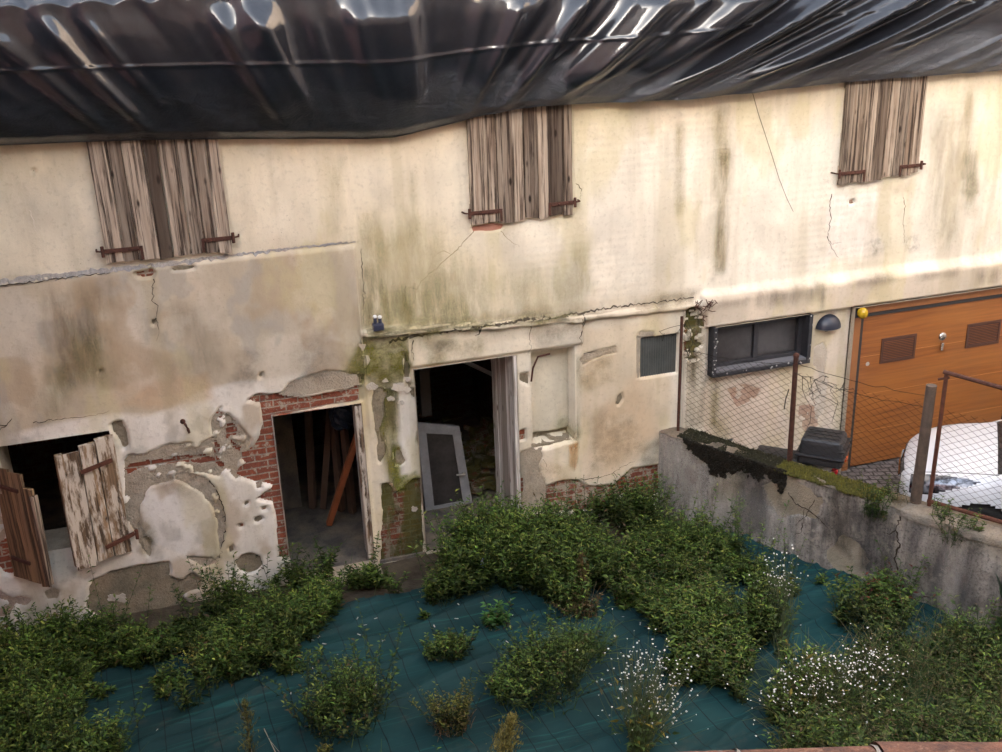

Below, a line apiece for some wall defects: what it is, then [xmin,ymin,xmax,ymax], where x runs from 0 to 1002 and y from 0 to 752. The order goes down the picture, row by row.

flaking render [86,343,414,617]
flaking render [0,514,13,573]
flaking render [0,591,31,617]